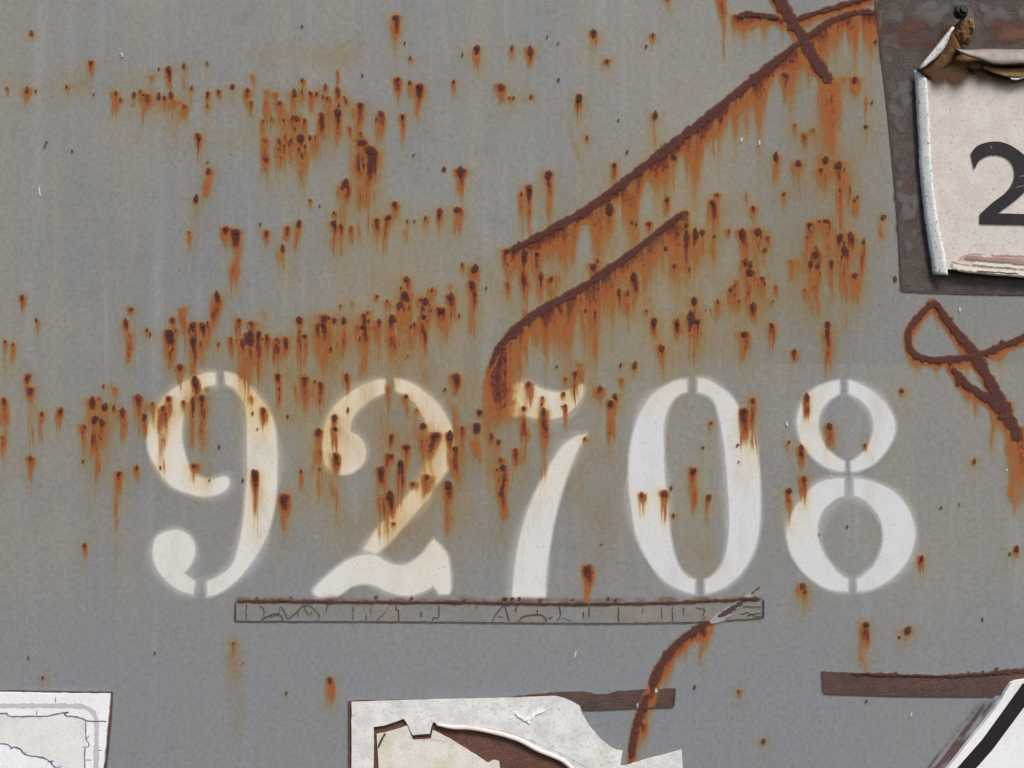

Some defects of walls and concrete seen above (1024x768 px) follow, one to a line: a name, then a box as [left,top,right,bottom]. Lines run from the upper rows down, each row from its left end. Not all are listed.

rust [111,63,193,119]
rust [220,226,242,287]
rust [206,70,467,254]
rust [664,192,778,360]
peeling [490,0,1024,441]
rust [789,76,873,371]
rust [79,262,487,512]
rust [278,493,291,530]
rust [376,381,549,531]
rust [638,486,675,519]
rust [736,398,756,447]
rust [785,441,808,523]